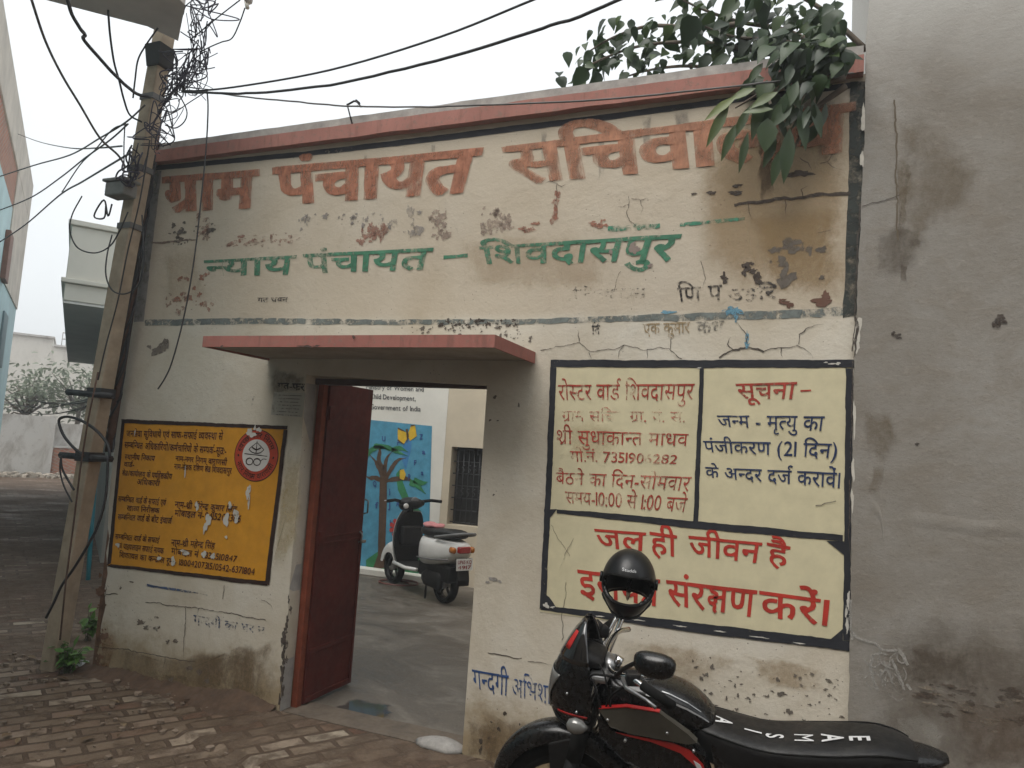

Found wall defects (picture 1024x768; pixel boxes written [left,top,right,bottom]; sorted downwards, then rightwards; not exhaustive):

peeling [152,213,216,245]
peeling [226,208,452,247]
peeling [480,191,561,235]
peeling [741,237,827,309]
peeling [810,275,832,307]
crack [541,331,682,359]
crack [719,100,899,560]
peeling [195,485,251,539]
peeling [157,549,215,566]